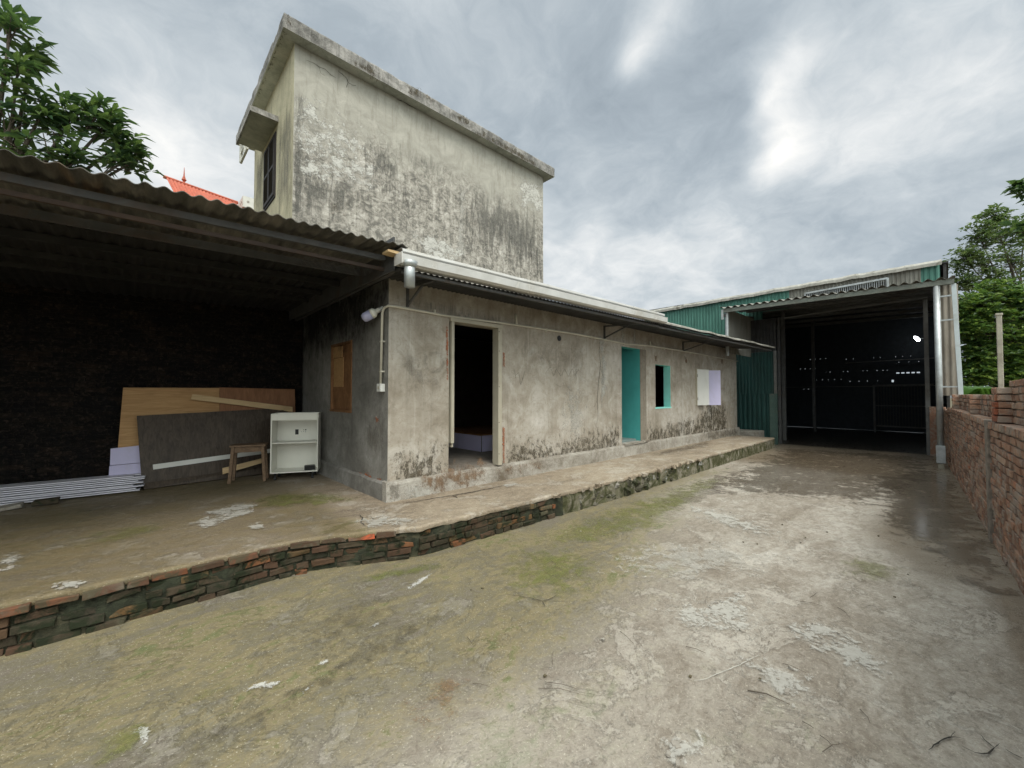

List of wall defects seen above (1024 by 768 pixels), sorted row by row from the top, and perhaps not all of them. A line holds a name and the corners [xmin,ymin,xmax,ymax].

leakage [456,190,540,265]
leakage [647,405,727,441]
leakage [391,444,446,479]
leakage [507,426,622,461]